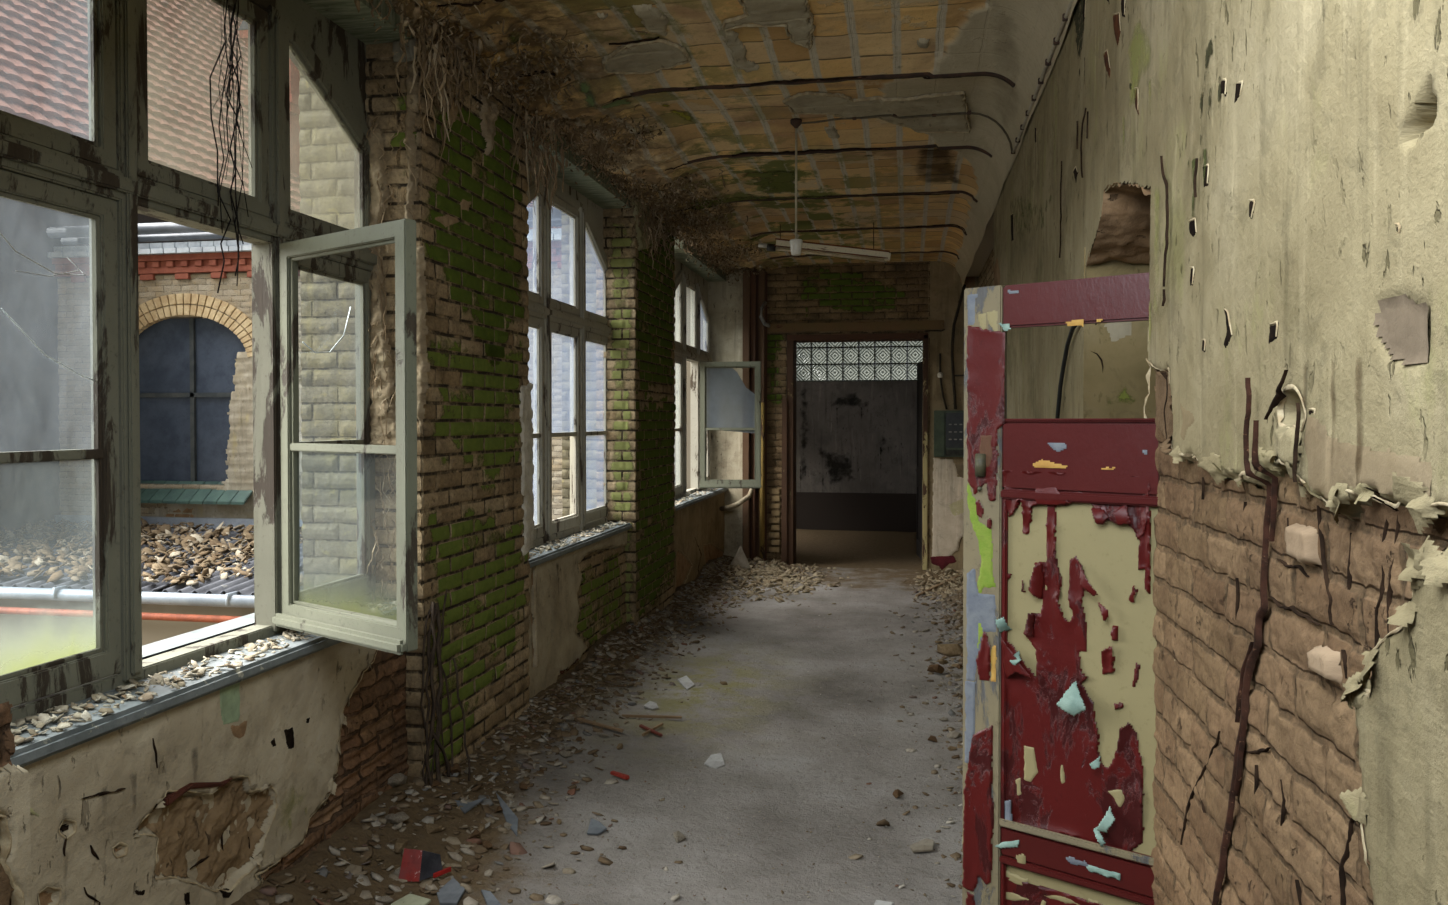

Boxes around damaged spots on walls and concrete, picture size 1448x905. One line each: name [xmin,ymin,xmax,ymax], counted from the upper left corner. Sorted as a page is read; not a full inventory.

flaking render [112,650,409,898]
flaking render [930,275,1448,905]
crack [1180,370,1401,905]